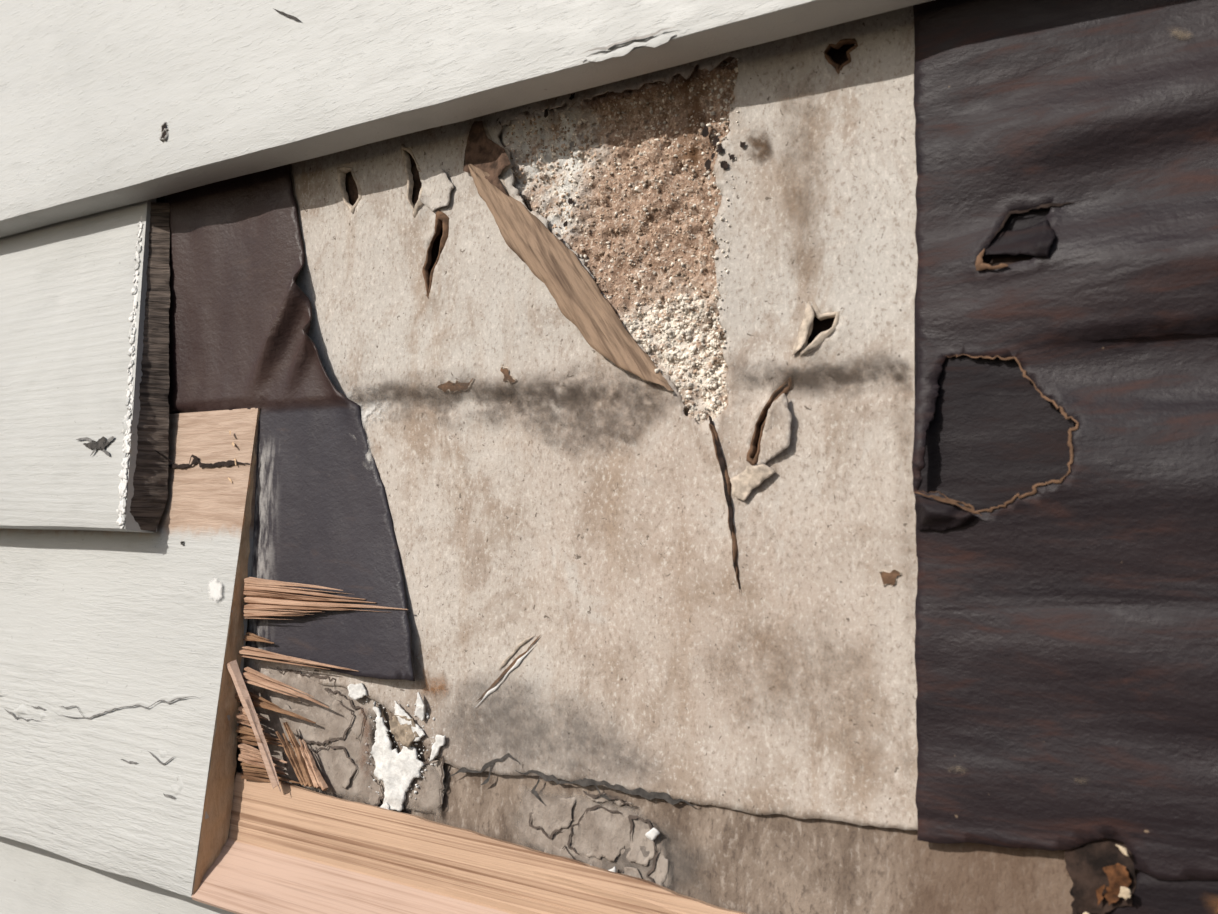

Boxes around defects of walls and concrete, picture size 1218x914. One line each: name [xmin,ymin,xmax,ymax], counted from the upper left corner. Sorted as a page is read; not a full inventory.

peeling [468,164,674,391]
leakage [347,387,459,422]
leakage [478,382,632,440]
leakage [768,368,859,388]
crack [448,753,697,806]
peeling [1118,886,1131,900]